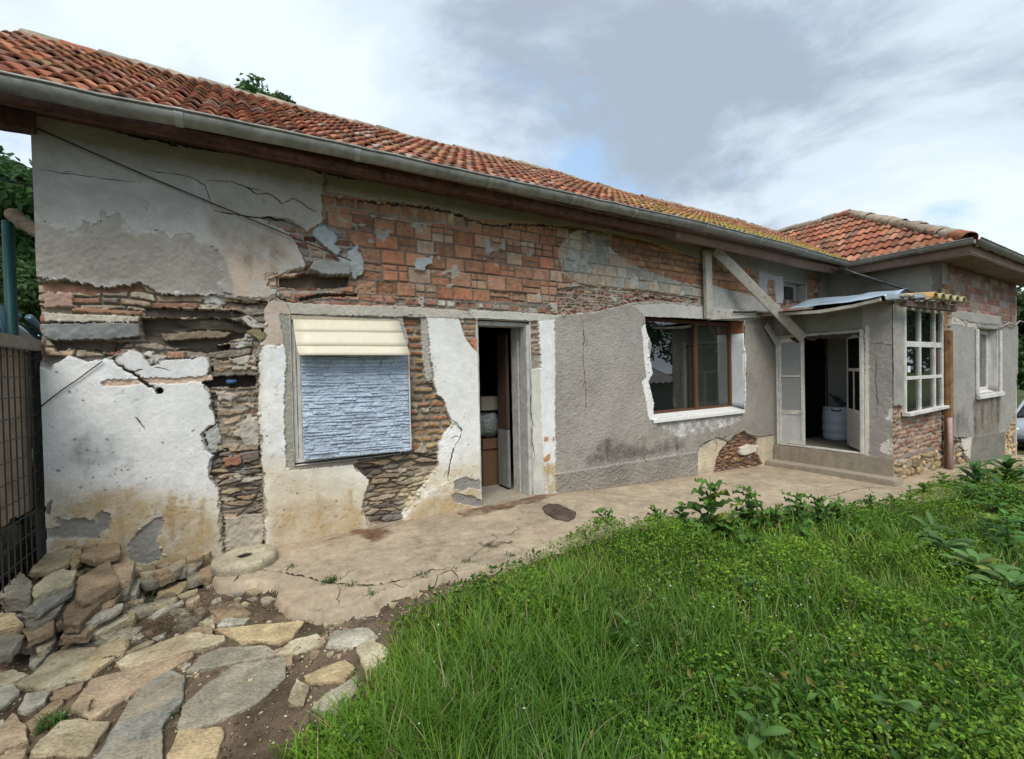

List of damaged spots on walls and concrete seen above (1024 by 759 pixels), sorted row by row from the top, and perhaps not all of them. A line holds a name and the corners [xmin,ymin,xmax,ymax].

crack [38,169,573,230]
crack [94,343,170,389]
flaking render [34,193,822,552]
crack [582,295,694,411]
crack [443,419,462,479]
flaking render [881,404,970,479]
peeling [128,511,190,565]
crack [234,529,519,603]